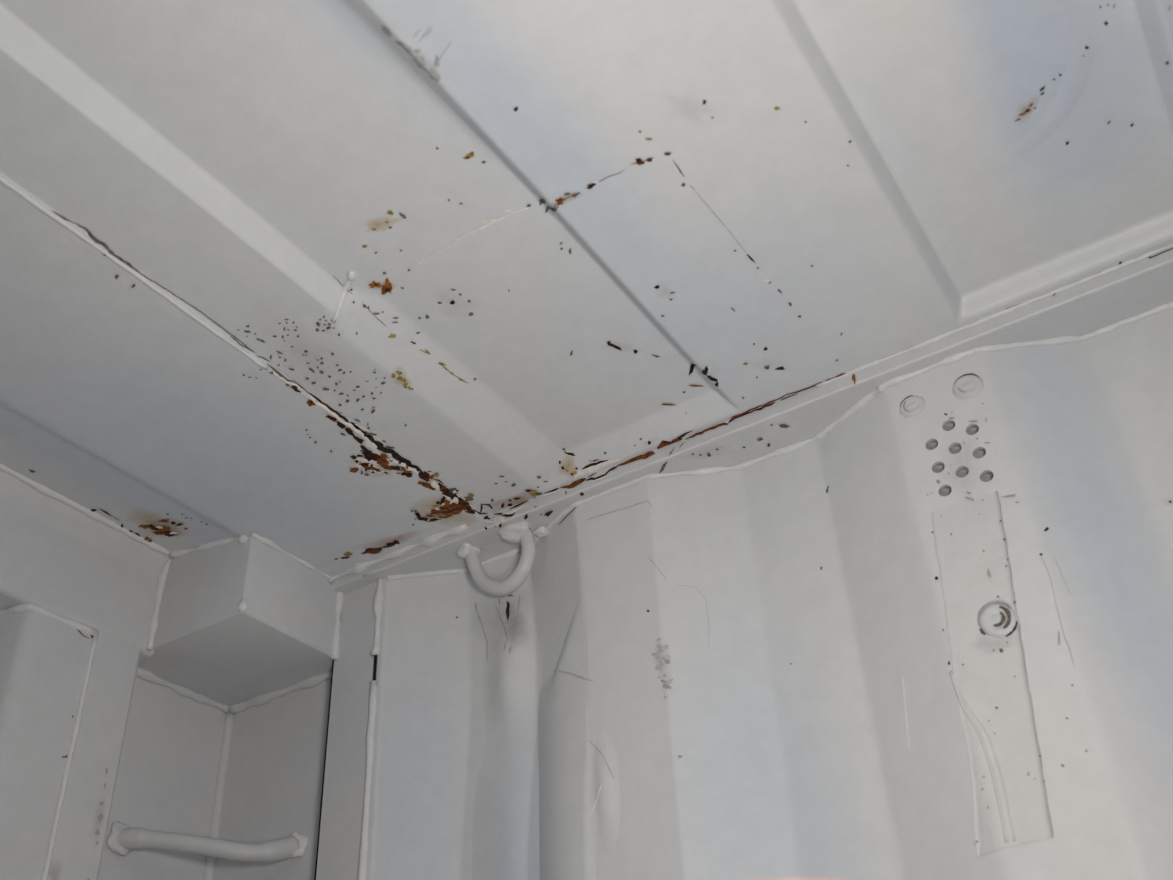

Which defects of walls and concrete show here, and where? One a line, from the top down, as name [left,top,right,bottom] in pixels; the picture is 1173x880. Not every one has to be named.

corrosion [138,514,208,542]
corrosion [335,540,399,562]